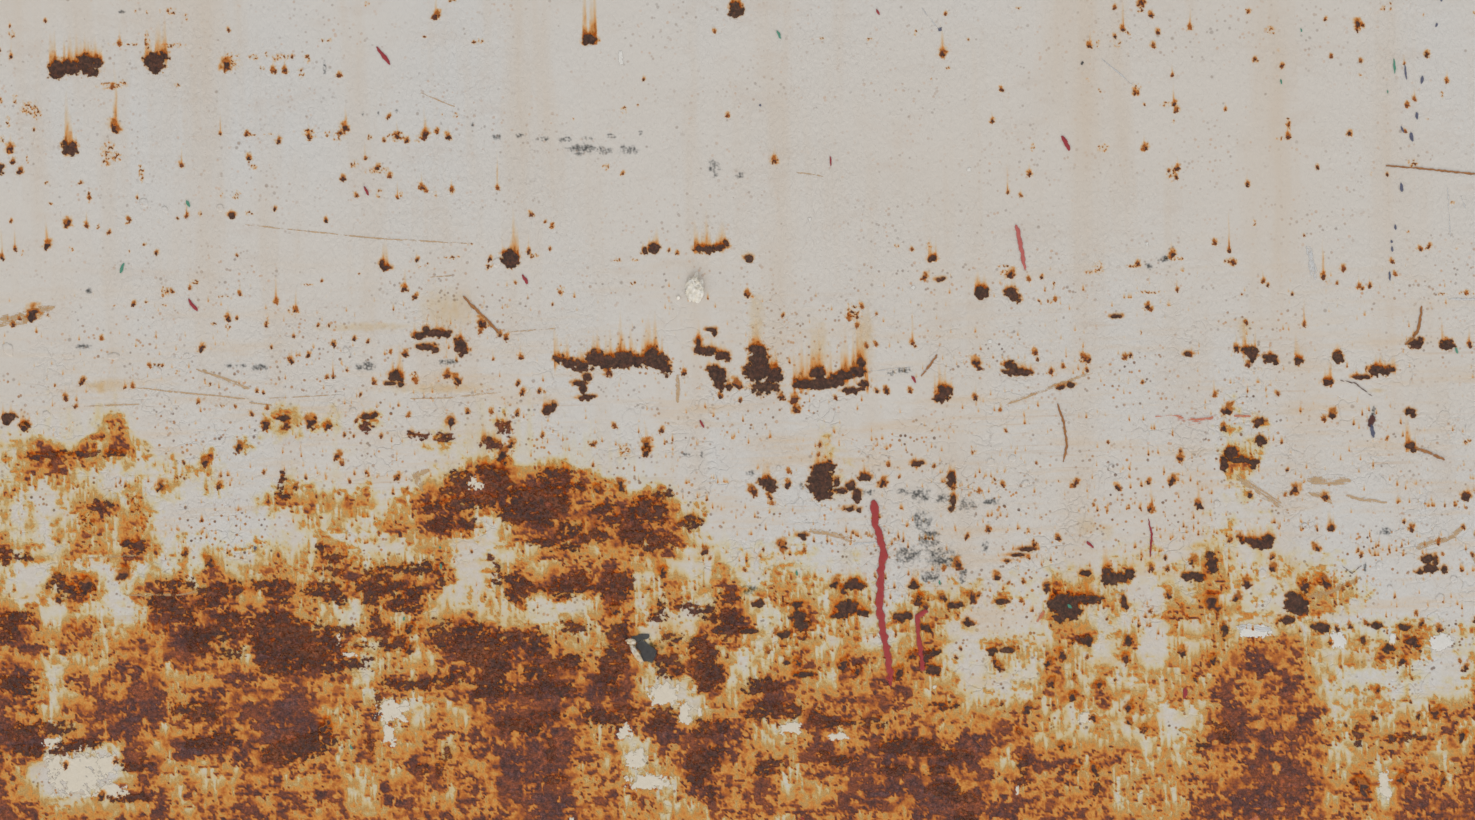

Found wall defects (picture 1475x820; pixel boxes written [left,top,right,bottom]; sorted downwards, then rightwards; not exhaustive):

rust [846,304,878,348]
rust [1032,350,1091,376]